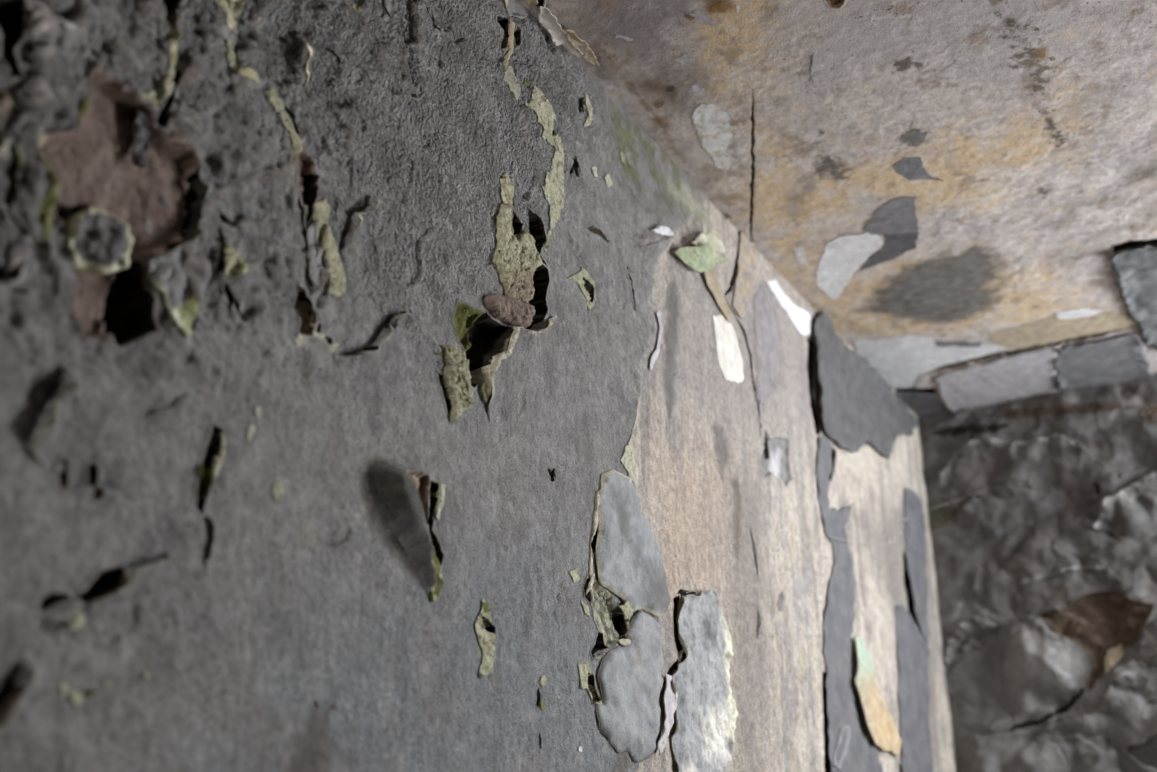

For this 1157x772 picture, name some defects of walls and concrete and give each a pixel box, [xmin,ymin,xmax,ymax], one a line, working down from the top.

spalling [0,0,37,83]
peeling [505,0,600,66]
spalling [0,63,211,352]
peeling [264,88,381,335]
spalling [451,207,564,423]
peeling [793,196,919,300]
peeling [892,157,943,181]
water stain [873,247,1003,323]
peeling [34,366,109,505]
peeling [567,259,738,772]
peeling [673,231,1157,772]
spalling [36,552,178,638]